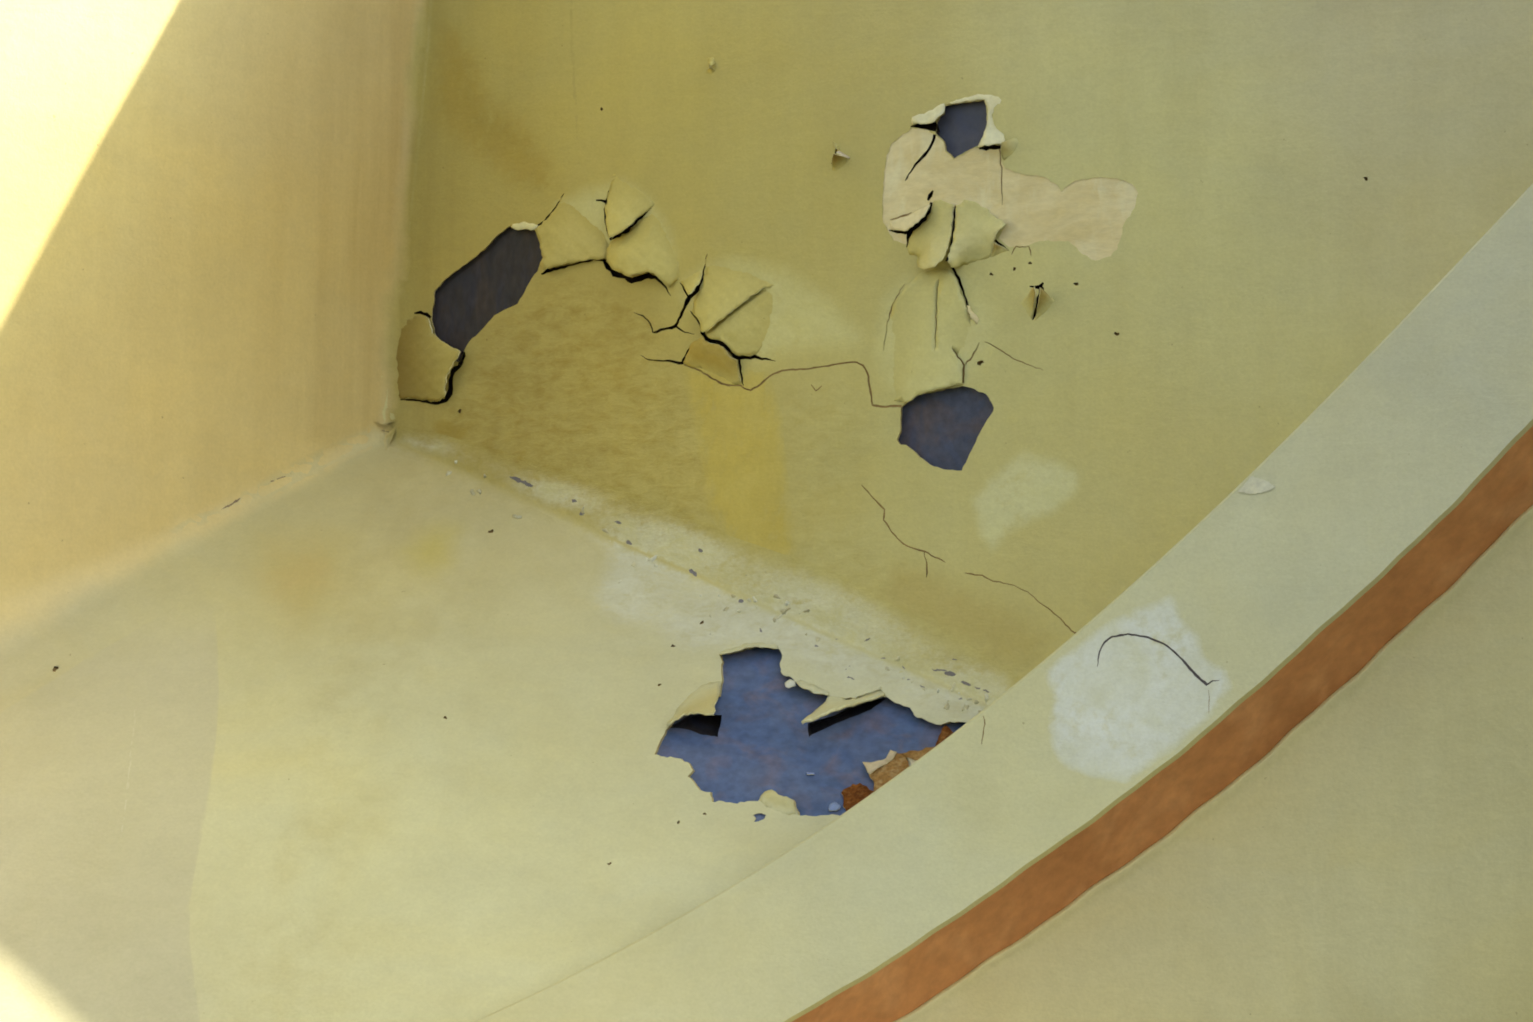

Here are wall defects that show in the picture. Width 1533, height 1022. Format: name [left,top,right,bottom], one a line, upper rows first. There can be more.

peeling [511,94,1138,403]
crack [634,255,1042,408]
crack [862,486,1219,700]
peeling [829,725,953,811]